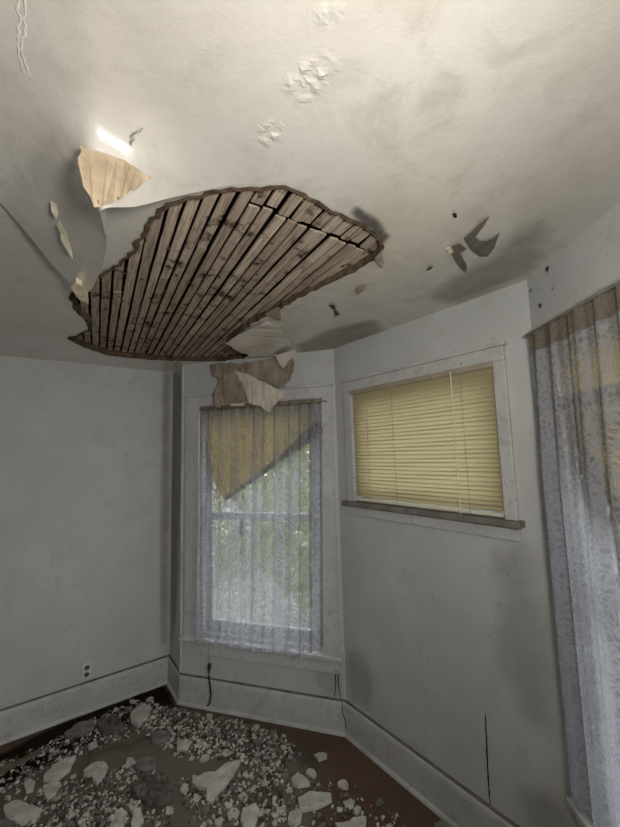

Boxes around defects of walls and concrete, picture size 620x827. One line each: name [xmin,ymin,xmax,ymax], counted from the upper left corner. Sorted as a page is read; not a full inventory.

crack [15,0,31,76]
spalling [67,185,385,362]
peeling [445,216,500,273]
crack [484,714,492,805]